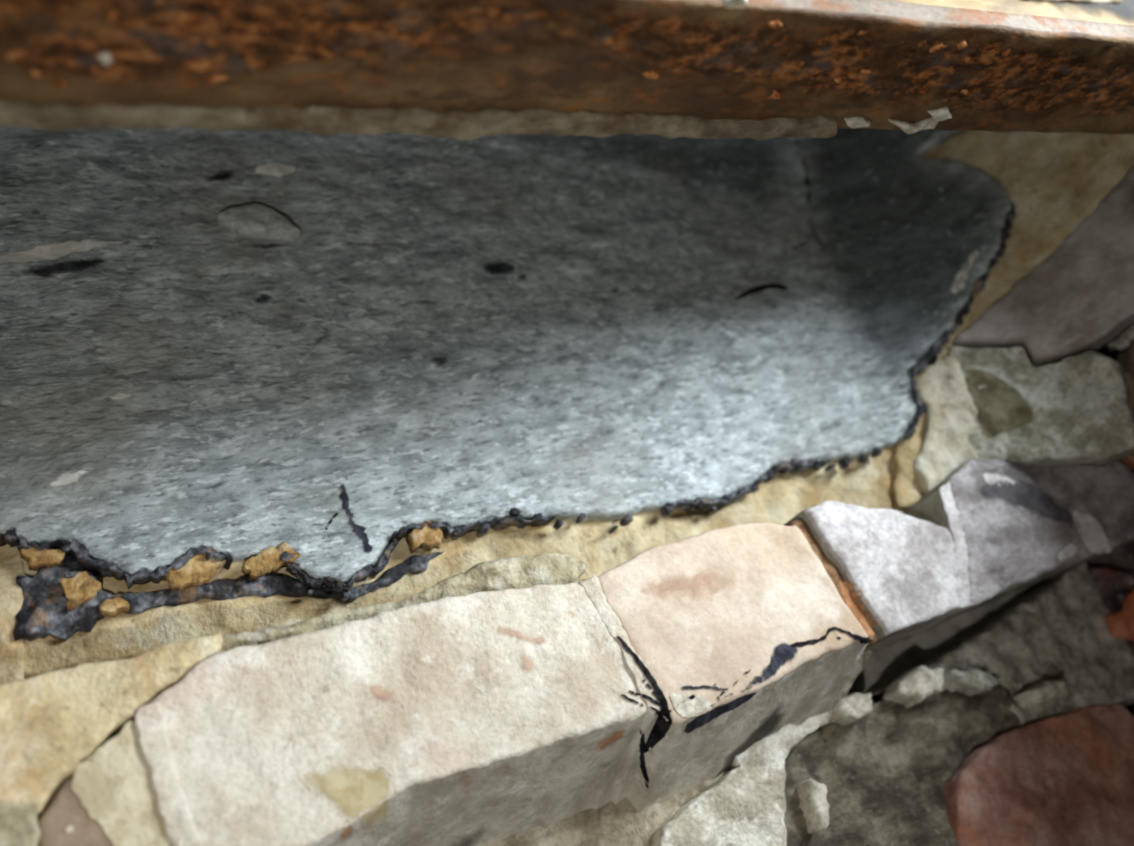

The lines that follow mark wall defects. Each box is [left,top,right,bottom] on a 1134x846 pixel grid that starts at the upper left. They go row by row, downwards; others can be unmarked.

rust [0,0,573,88]
rust [595,6,1134,117]
crack [326,478,373,553]
crack [792,627,873,647]
crack [617,636,695,789]